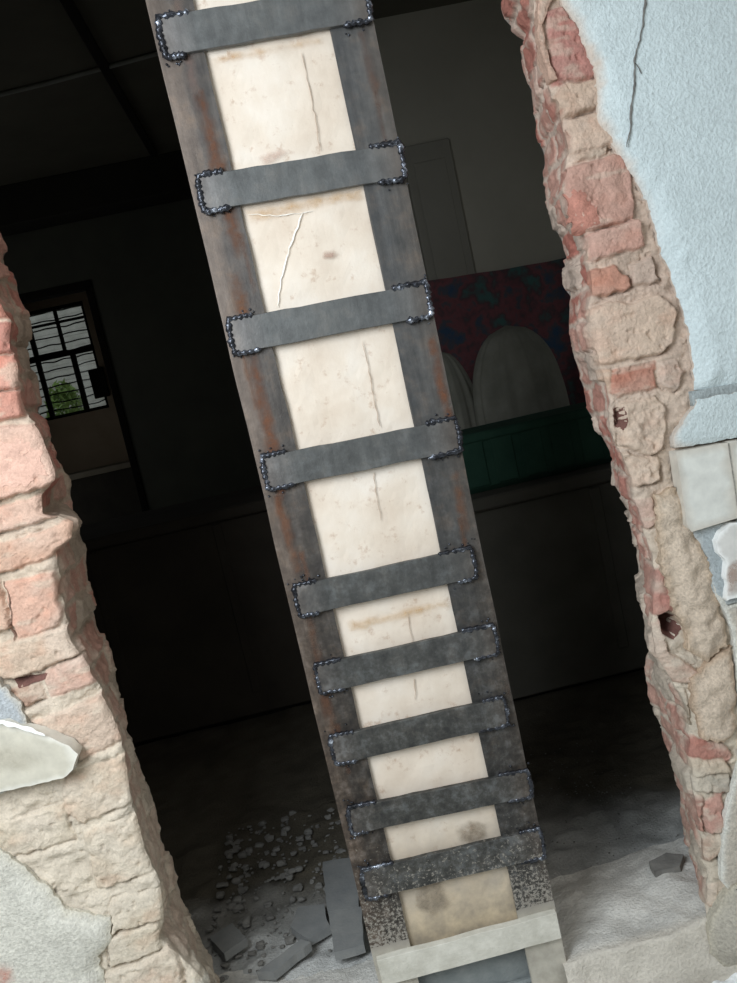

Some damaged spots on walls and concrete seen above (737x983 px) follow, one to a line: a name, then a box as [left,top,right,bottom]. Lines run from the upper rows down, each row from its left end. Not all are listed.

crack [626,0,647,147]
spalling [0,303,203,983]
spalling [533,0,737,914]